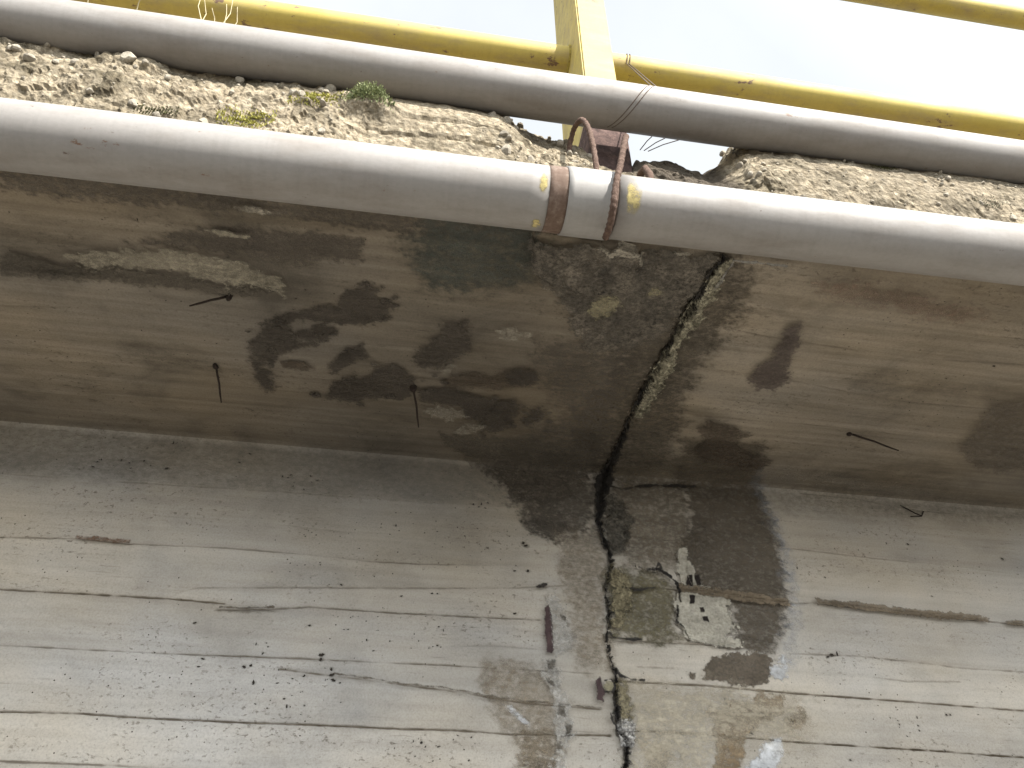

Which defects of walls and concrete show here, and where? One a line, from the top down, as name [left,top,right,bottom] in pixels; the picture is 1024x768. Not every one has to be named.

damp [0,171,506,268]
rust [541,165,570,234]
damp [245,281,400,391]
damp [309,252,805,768]
crack [333,254,788,768]
spalling [673,548,744,649]